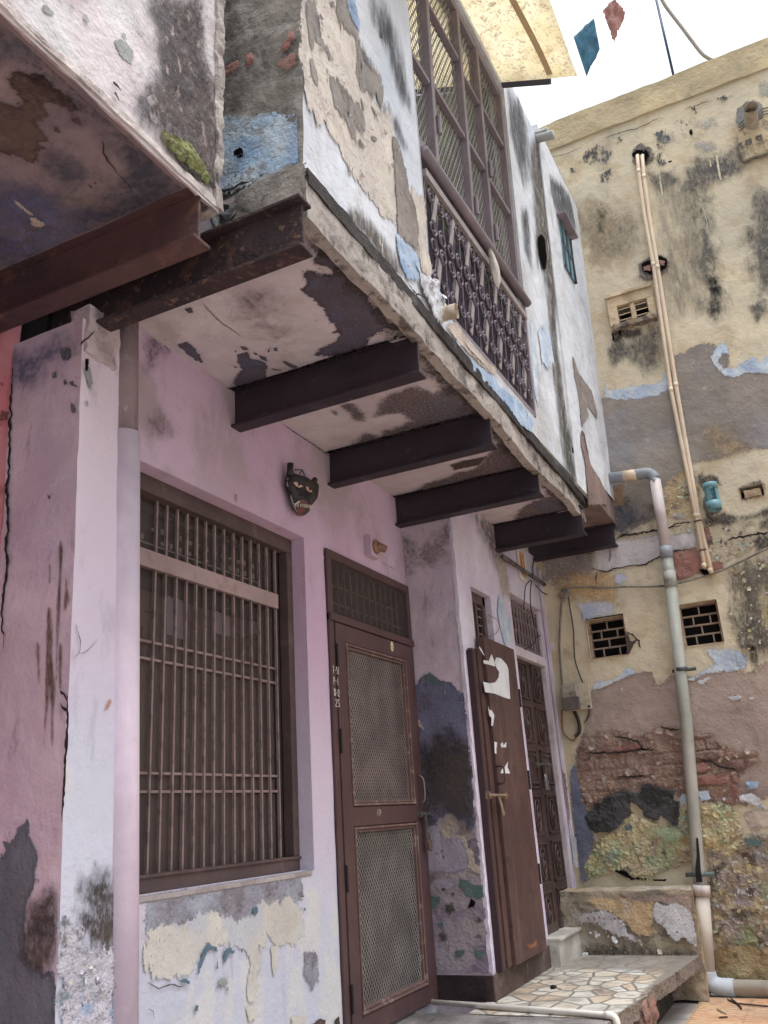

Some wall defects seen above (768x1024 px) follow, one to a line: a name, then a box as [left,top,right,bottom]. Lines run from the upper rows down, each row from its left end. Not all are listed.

peeling [219,0,554,431]
damp [648,130,742,319]
damp [747,191,768,321]
crack [0,368,13,650]
corrosion [37,542,68,738]
crack [592,522,693,585]
peeling [556,341,768,621]
damp [23,892,57,970]
damp [81,873,114,951]
peeling [416,672,489,975]
crack [589,726,679,778]
flaking render [559,648,768,980]